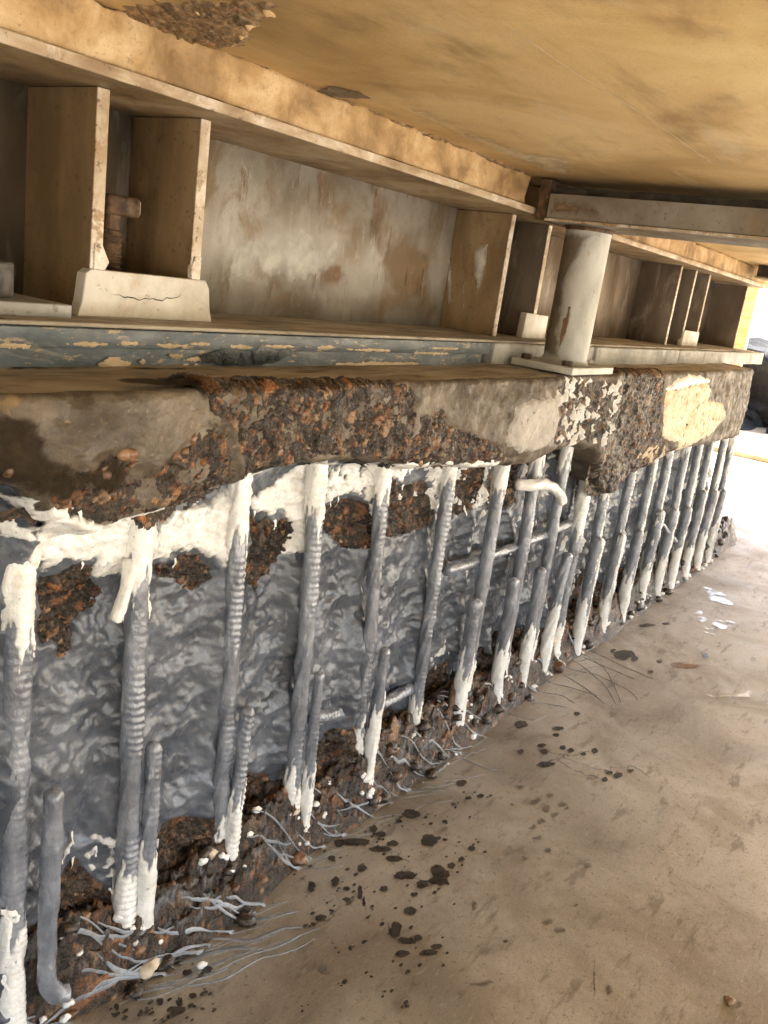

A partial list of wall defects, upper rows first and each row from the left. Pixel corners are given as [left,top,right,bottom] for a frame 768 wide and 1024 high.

spalling [100,0,278,69]
crack [120,294,179,302]
rust [313,267,345,292]
rust [370,191,427,298]
rust [544,235,583,355]
leakage [0,416,126,499]
spalling [51,340,529,537]
spalling [554,367,726,498]
spalling [245,514,294,591]
spalling [323,498,372,549]
spalling [36,563,102,658]
spalling [315,725,359,777]